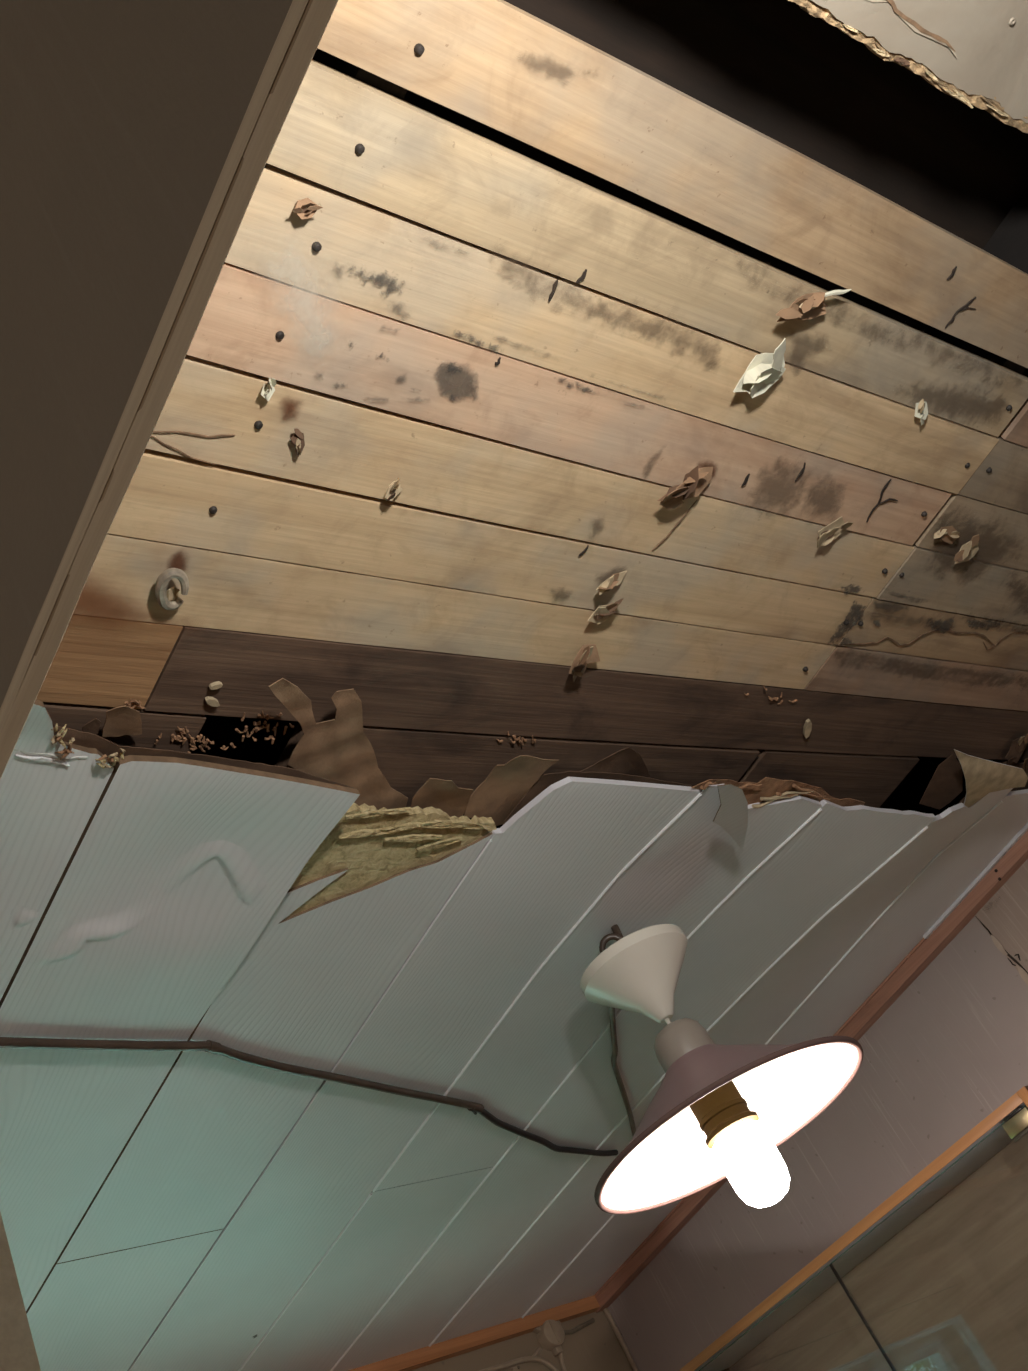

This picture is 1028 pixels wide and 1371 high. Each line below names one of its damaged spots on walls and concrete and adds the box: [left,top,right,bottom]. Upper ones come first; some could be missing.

crack [867,0,957,58]
spalling [788,0,1028,133]
damp [438,363,476,401]
crack [866,479,898,522]
peeling [919,749,1028,810]
peeling [338,807,492,852]
peeling [713,784,748,850]
crack [975,916,1028,974]